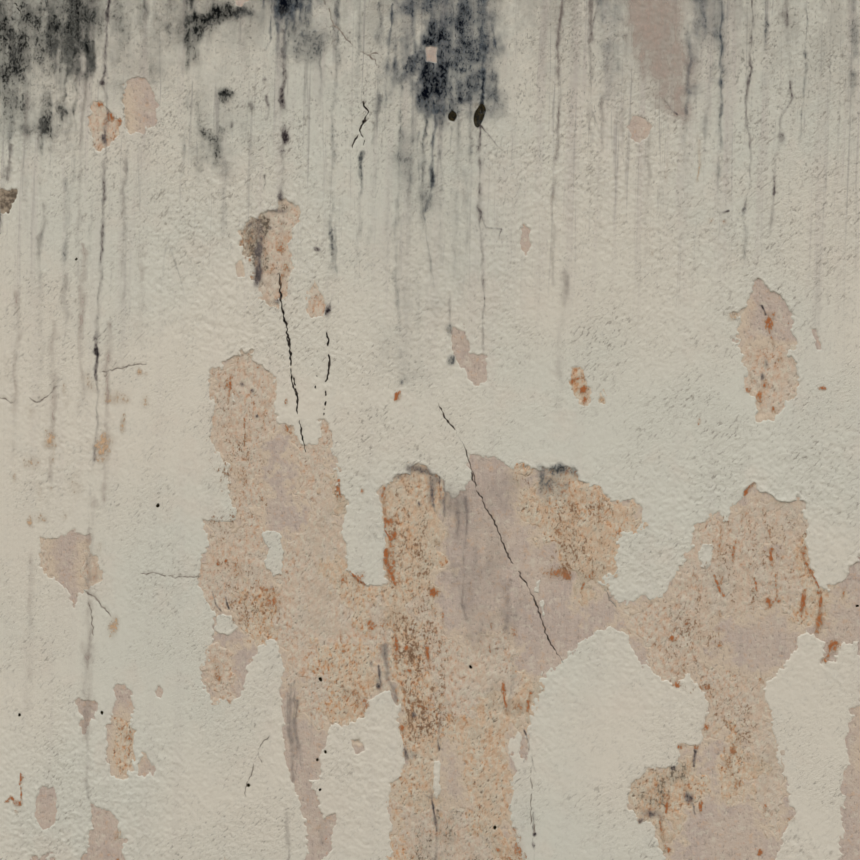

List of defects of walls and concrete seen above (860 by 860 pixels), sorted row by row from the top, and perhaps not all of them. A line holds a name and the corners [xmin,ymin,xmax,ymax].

water stain [25,89,77,138]
water stain [0,0,118,123]
water stain [166,0,253,66]
water stain [263,0,325,108]
water stain [378,0,498,153]
spalling [0,188,18,214]
peeling [235,196,301,309]
crack [276,267,331,452]
peeling [732,269,803,422]
peeling [39,529,103,608]
crack [439,407,562,660]
peeling [197,344,860,860]